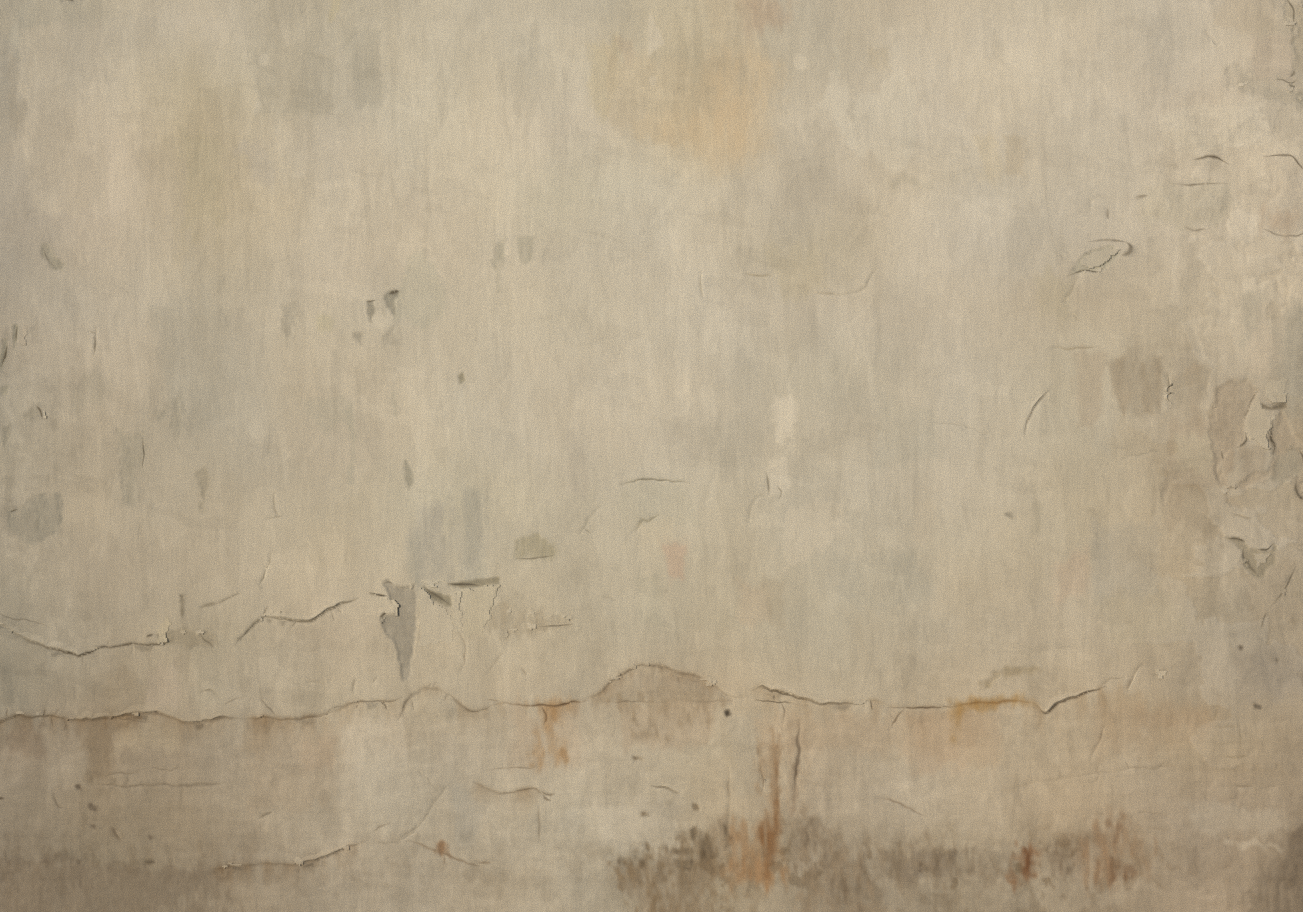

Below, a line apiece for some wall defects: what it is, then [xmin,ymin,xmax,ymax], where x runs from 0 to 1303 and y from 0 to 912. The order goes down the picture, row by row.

peeling [1066,237,1137,277]
peeling [1207,377,1303,502]
peeling [1222,534,1279,581]
peeling [372,576,583,683]
crack [0,629,1143,838]
leakage [613,819,734,873]
corrosion [714,809,793,902]
leakage [750,735,868,912]
leakage [929,843,977,886]
leakage [1245,825,1303,912]